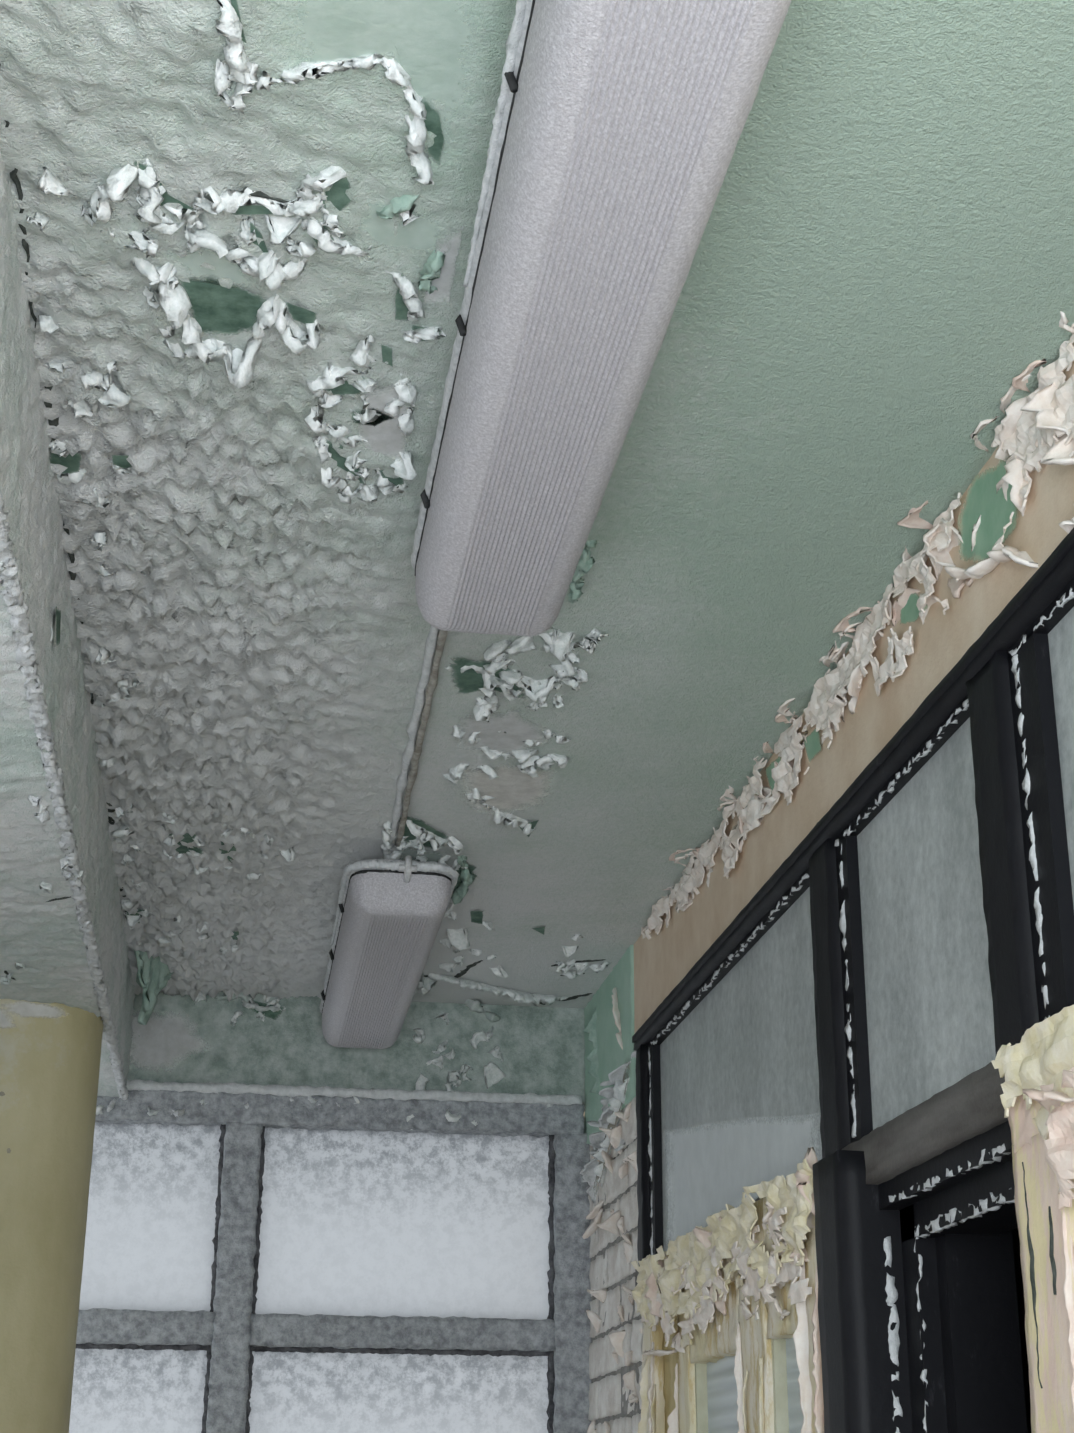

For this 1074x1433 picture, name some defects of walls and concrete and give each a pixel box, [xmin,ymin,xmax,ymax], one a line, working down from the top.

peeling [214,0,445,226]
spalling [110,455,137,475]
peeling [81,159,373,389]
peeling [305,233,461,504]
spalling [442,627,609,837]
spalling [568,540,597,604]
peeling [641,311,1074,940]
peeling [551,933,611,980]
peeling [580,987,824,1433]
peeling [991,1005,1074,1416]